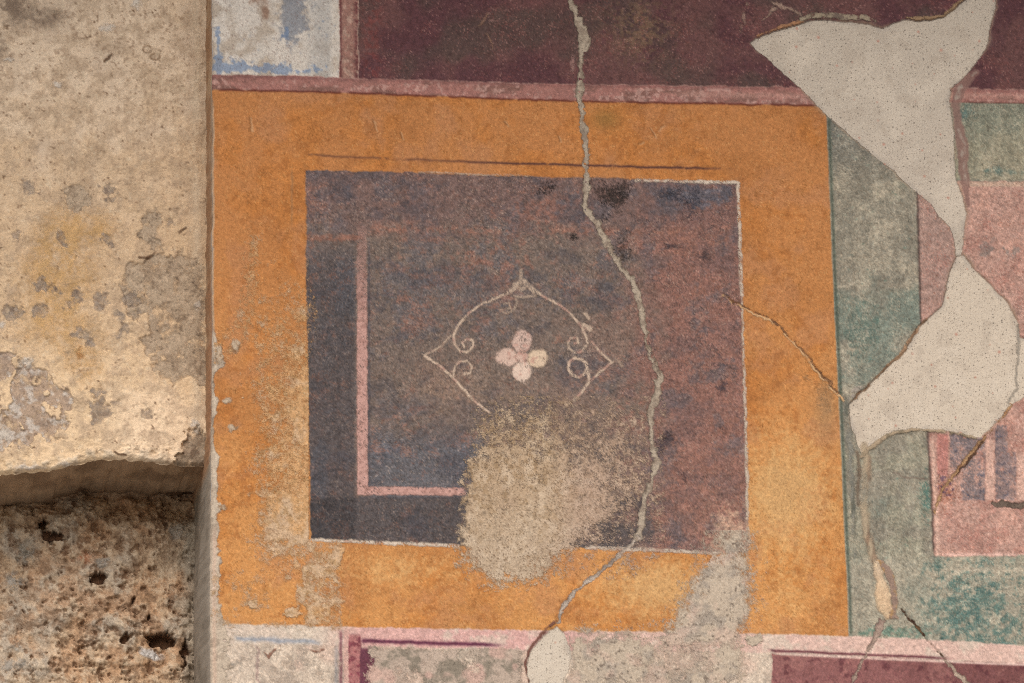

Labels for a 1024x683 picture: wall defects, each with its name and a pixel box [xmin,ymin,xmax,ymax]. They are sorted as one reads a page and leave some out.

flaking render [751,0,1024,458]
crack [556,0,664,624]
crack [722,295,844,402]
peeling [454,396,665,592]
crack [934,403,1012,514]
peeling [363,530,763,683]
crack [852,609,970,683]